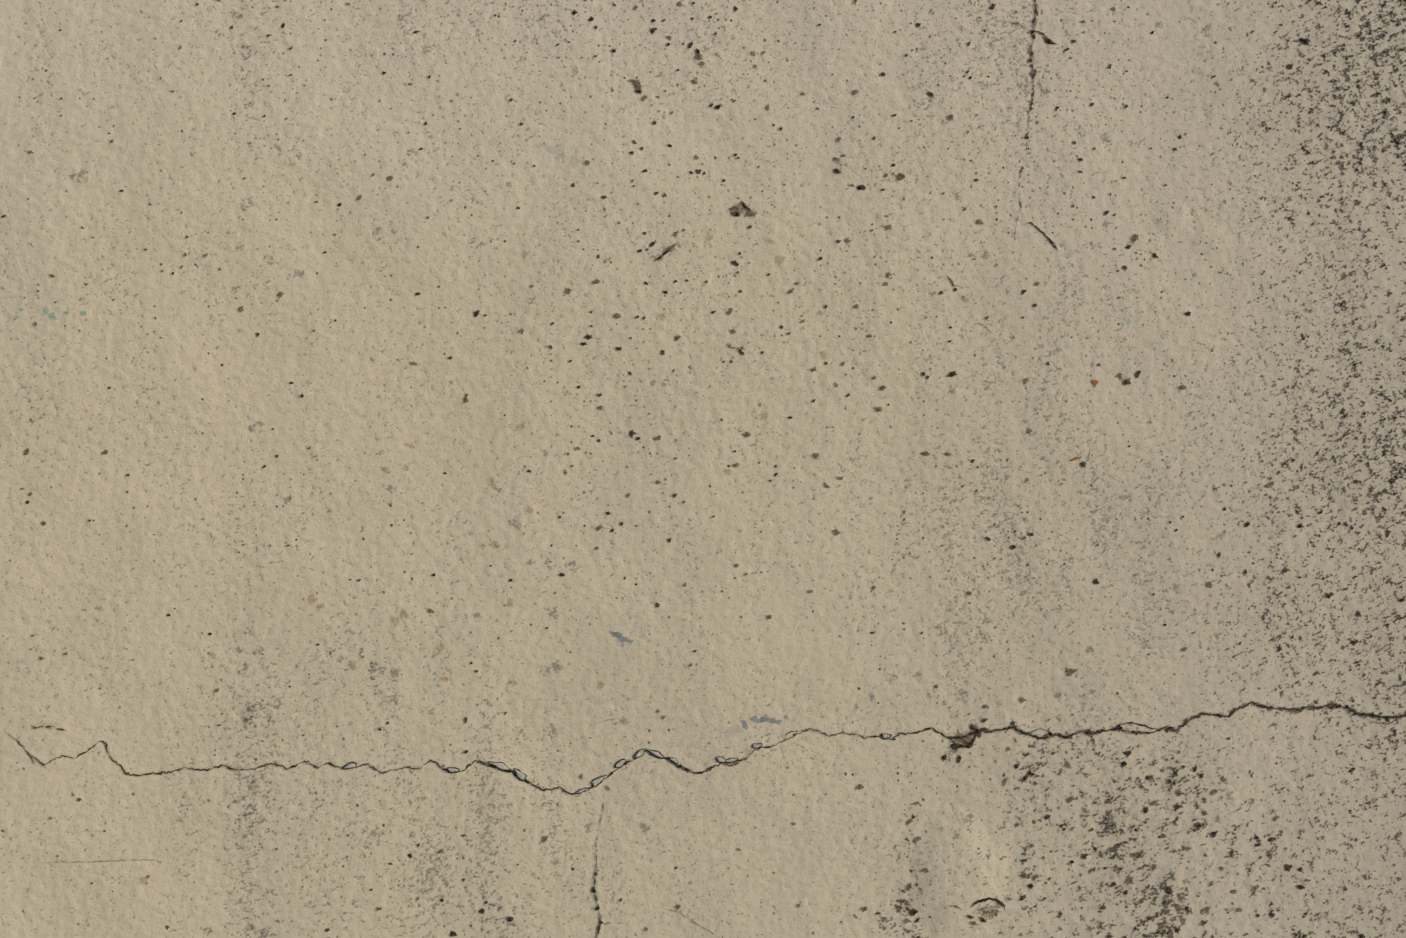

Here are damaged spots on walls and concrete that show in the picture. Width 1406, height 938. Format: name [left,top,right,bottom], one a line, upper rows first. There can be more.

crack [1011,0,1058,236]
crack [6,702,1406,937]